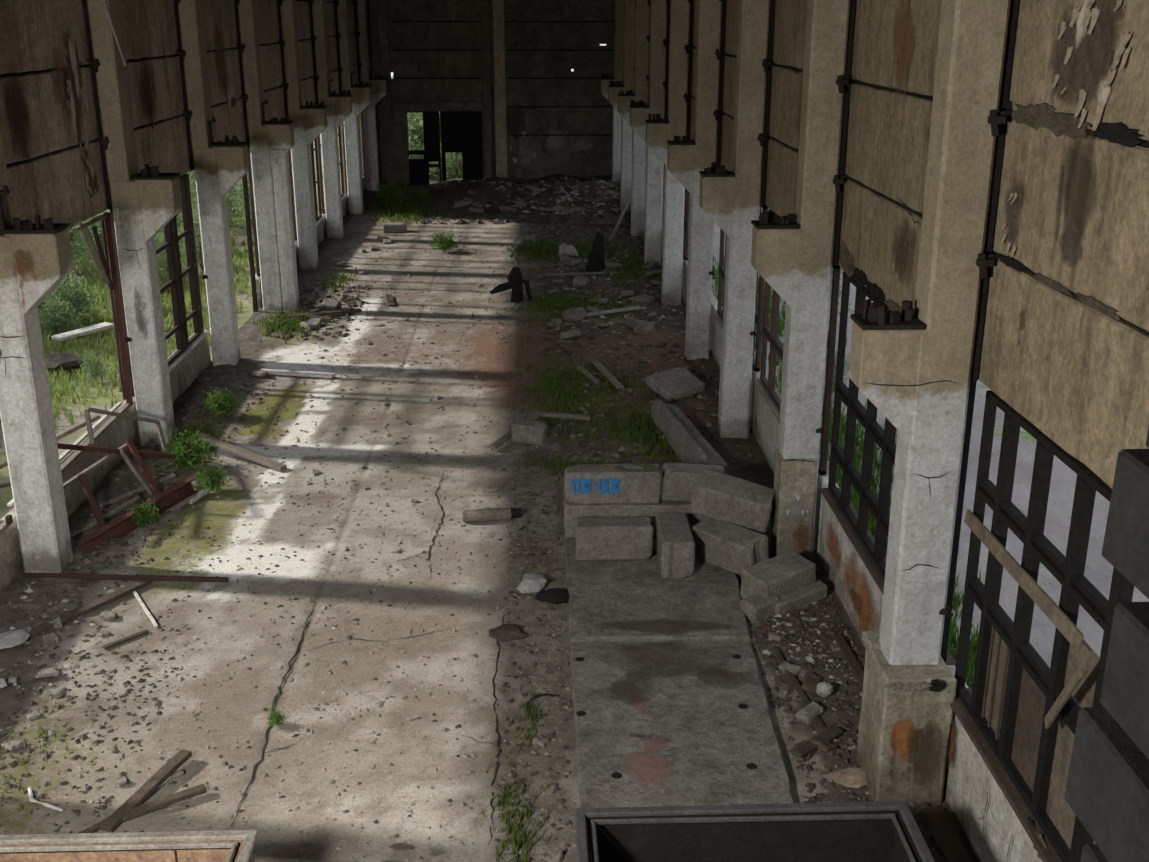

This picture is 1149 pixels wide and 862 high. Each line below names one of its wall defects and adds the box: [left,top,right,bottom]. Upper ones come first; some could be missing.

damp [5,80,30,168]
peeling [1006,0,1144,148]
spalling [839,240,902,314]
crack [397,472,462,575]
rust [825,524,878,632]
crack [231,602,452,827]
rust [889,720,922,778]